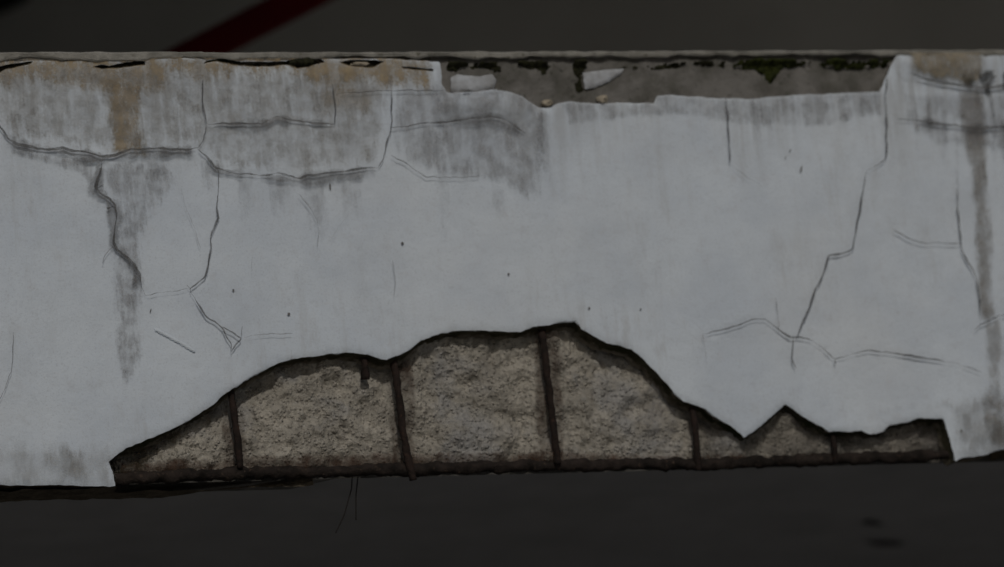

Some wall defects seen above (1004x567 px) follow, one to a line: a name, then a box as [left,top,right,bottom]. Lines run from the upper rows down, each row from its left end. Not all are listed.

leakage [0,57,237,151]
leakage [250,58,428,90]
peeling [402,55,895,108]
leakage [911,53,982,84]
crack [0,81,525,357]
crack [702,70,1004,372]
leakage [962,93,993,316]
spalling [112,321,955,486]
corrosion [122,458,226,473]